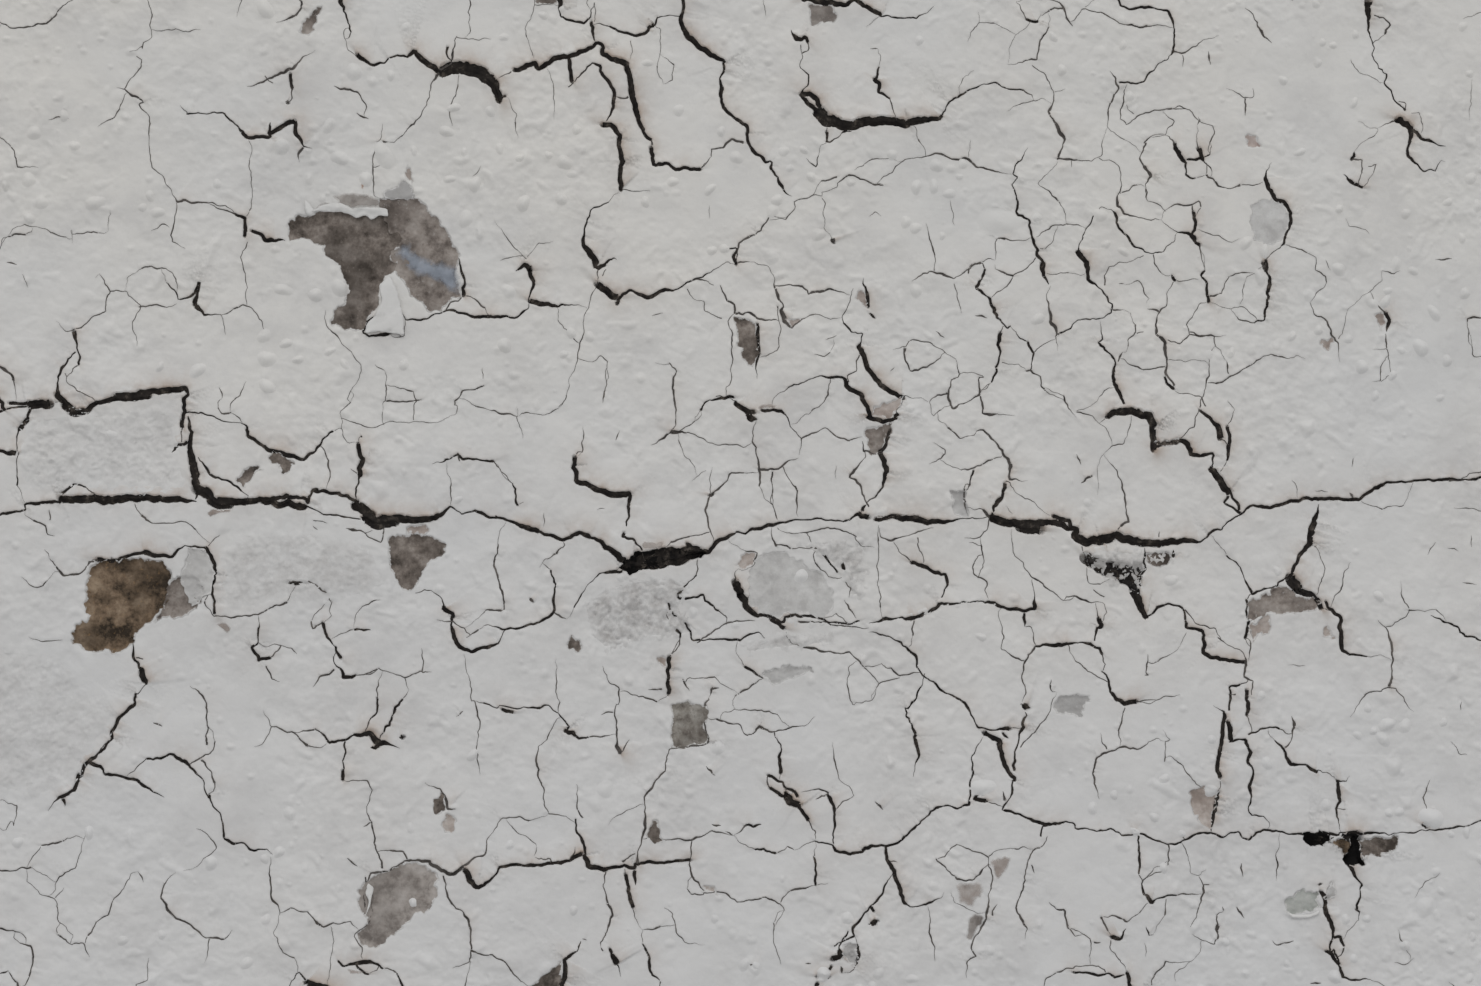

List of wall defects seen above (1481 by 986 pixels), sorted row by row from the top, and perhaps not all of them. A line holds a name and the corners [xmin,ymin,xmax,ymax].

peeling [286,165,461,335]
crack [0,0,1007,706]
crack [708,0,1481,986]
flaking render [71,524,446,654]
flaking render [1082,544,1192,594]
peeling [671,700,709,749]
crack [0,928,34,986]
crack [0,836,143,954]
crack [49,644,403,986]
peeling [357,862,439,948]
crack [259,598,819,986]
flaking render [1303,831,1398,866]